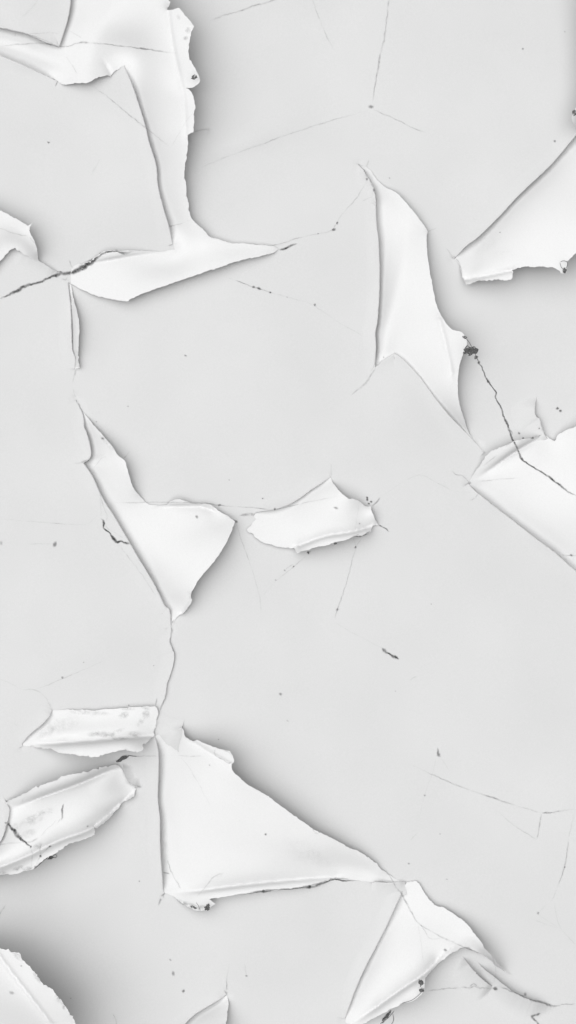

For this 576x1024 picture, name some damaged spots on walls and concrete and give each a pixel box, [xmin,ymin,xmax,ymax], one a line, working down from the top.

crack [5,251,121,297]
peeling [0,0,278,369]
peeling [65,400,235,628]
peeling [243,466,378,553]
peeling [351,164,576,588]
peeling [445,120,576,285]
crack [478,362,562,487]
peeling [0,705,556,1024]